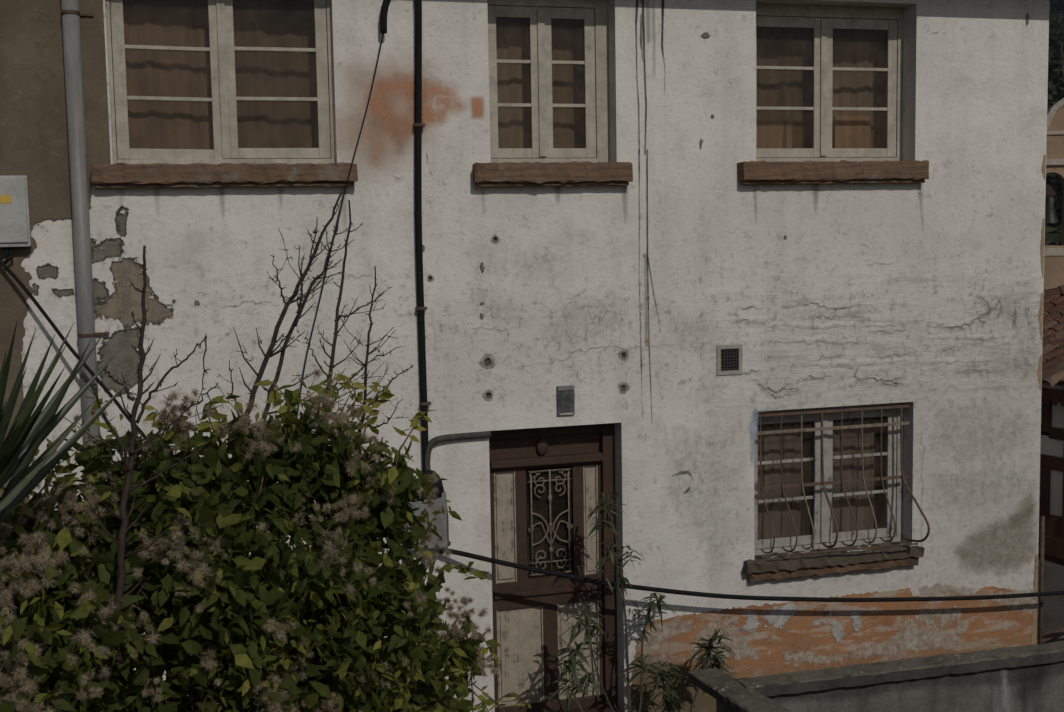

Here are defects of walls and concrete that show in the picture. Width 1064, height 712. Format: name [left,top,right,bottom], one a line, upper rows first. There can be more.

corrosion [358,81,482,144]
flaking render [32,263,75,297]
flaking render [91,205,176,397]
peeling [638,601,798,667]
peeling [783,554,1038,665]